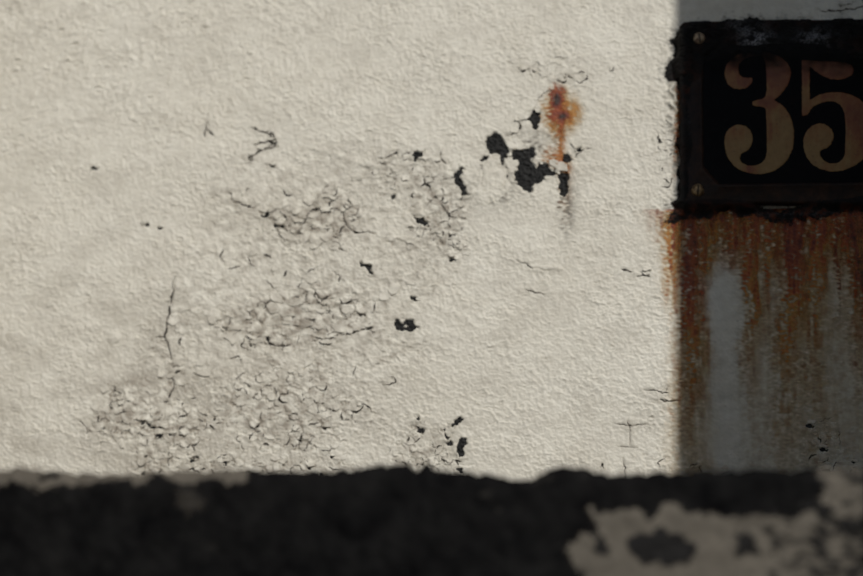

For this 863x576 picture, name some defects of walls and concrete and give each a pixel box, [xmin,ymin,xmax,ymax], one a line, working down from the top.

crack [248,123,278,168]
peeling [517,106,541,130]
peeling [480,132,584,199]
rust [541,86,580,174]
crack [232,189,375,251]
crack [155,282,183,403]
crack [227,302,291,369]
crack [292,291,377,345]
rust [657,208,863,416]
crack [79,383,130,434]